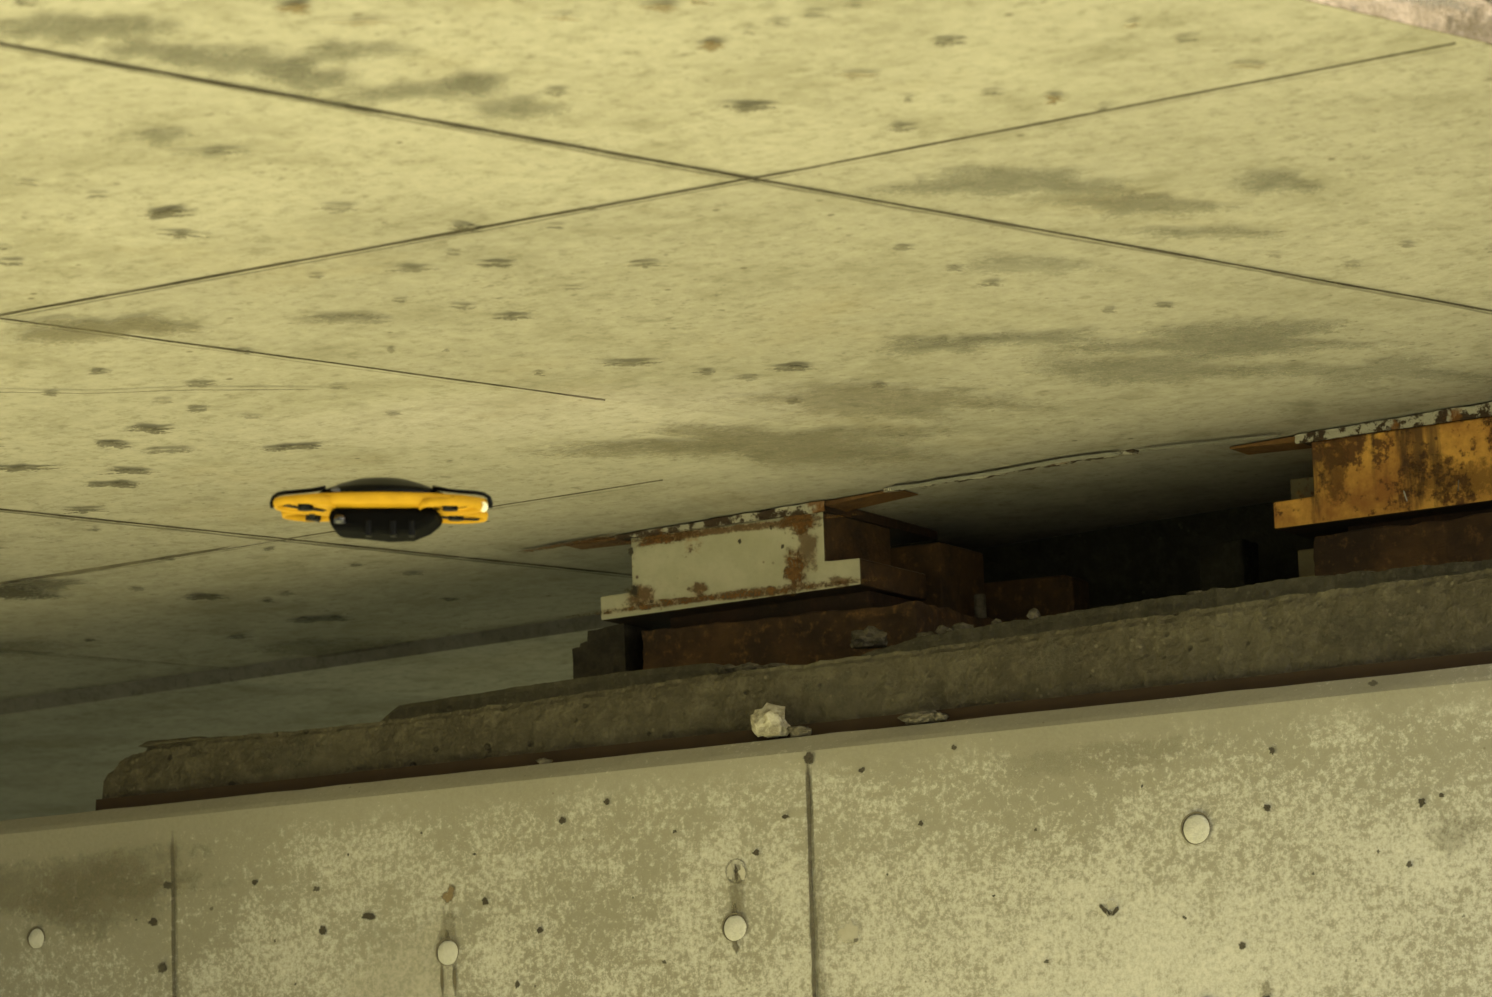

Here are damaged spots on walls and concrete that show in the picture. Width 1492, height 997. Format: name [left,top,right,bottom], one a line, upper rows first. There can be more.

corrosion [521,513,877,614]